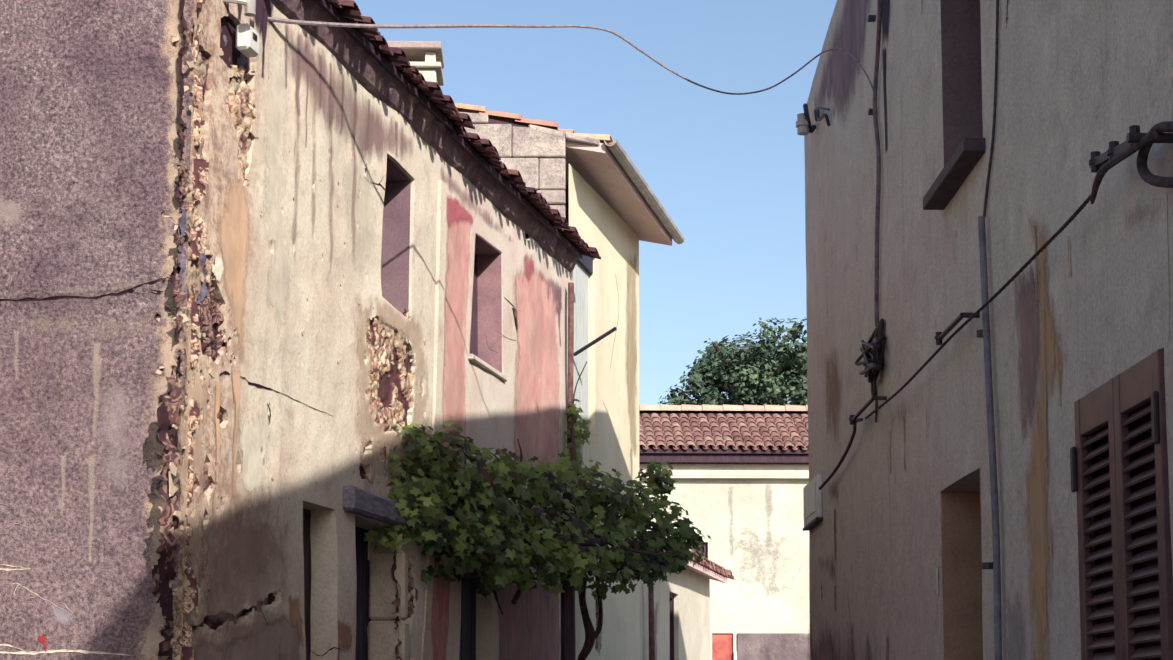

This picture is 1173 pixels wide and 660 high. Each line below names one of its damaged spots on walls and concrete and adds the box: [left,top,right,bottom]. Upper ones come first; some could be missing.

leakage [228,0,274,77]
leakage [285,24,407,232]
leakage [819,0,889,152]
crack [0,277,176,301]
spalling [137,0,302,660]
crack [220,371,333,424]
spalling [353,306,426,492]
peeling [442,197,473,510]
corrosion [1014,219,1062,660]